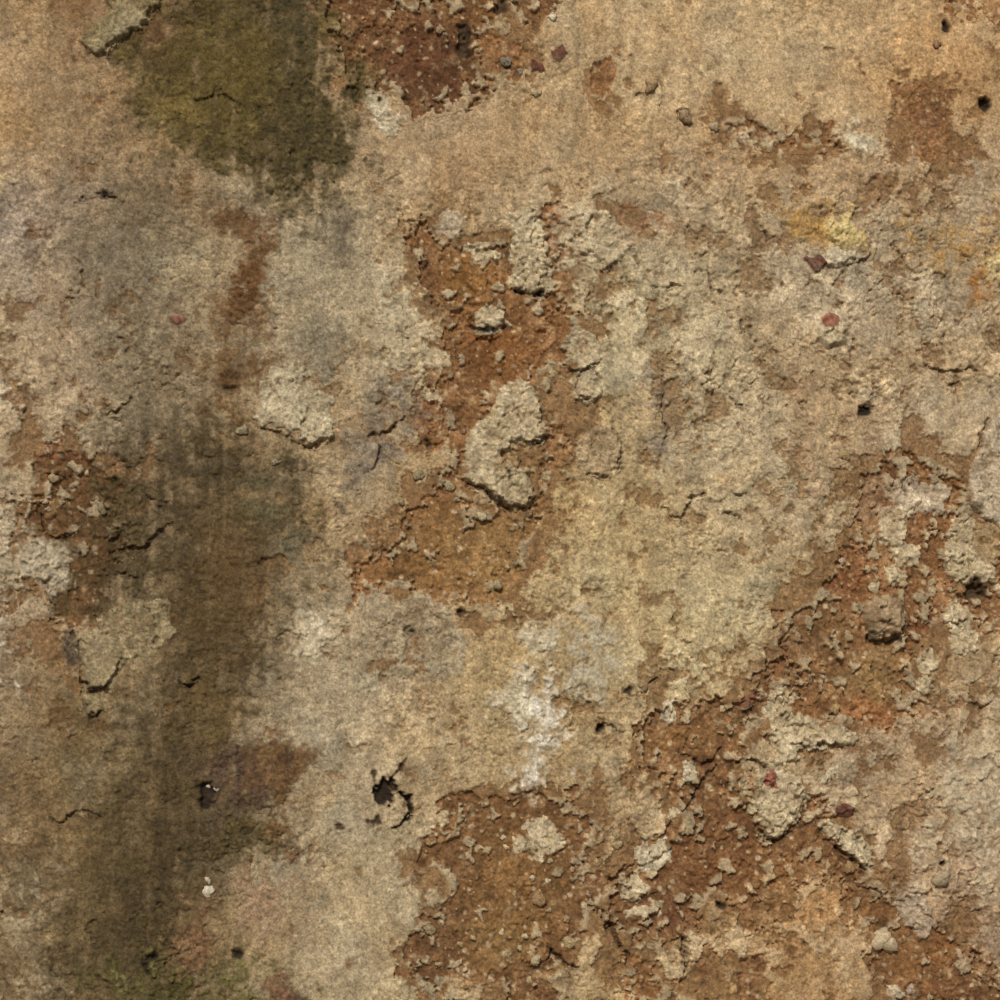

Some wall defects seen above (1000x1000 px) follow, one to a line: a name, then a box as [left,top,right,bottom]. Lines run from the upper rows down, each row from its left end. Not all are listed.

spalling [325,0,571,138]
damp [0,96,443,518]
spalling [344,200,621,621]
damp [52,627,86,676]
efflorescence [280,600,344,681]
damp [169,731,249,843]
spalling [391,448,1000,1000]
damp [283,966,329,1000]